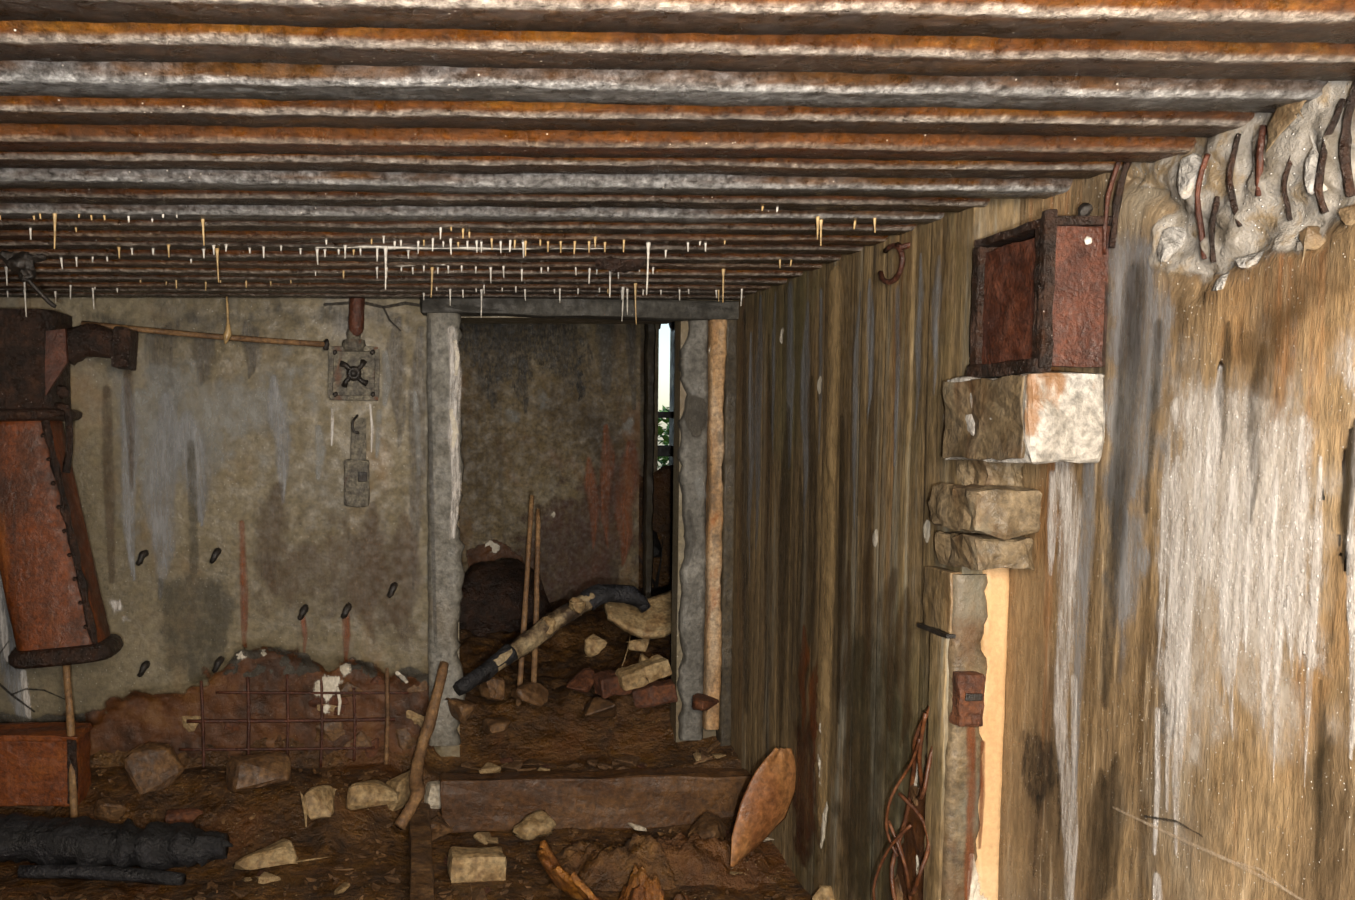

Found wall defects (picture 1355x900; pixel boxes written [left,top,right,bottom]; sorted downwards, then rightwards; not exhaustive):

spalling [1102,81,1355,291]
corrosion [240,521,248,648]
leakage [121,314,426,680]
leakage [1023,242,1331,900]